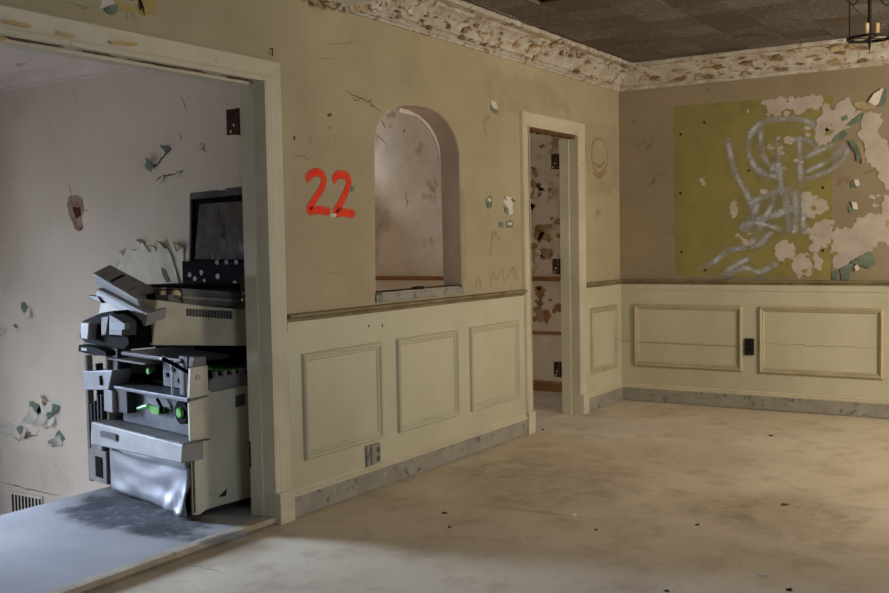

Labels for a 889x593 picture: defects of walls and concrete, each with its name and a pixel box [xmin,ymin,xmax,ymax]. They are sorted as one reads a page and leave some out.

peeling [100,0,145,15]
peeling [390,0,515,48]
peeling [514,38,634,85]
peeling [649,57,762,82]
peeling [771,44,876,71]
crack [346,90,405,145]
spalling [67,186,88,231]
peeling [530,136,560,262]
peeling [729,199,738,218]
peeling [746,88,889,280]
peeling [532,286,561,324]